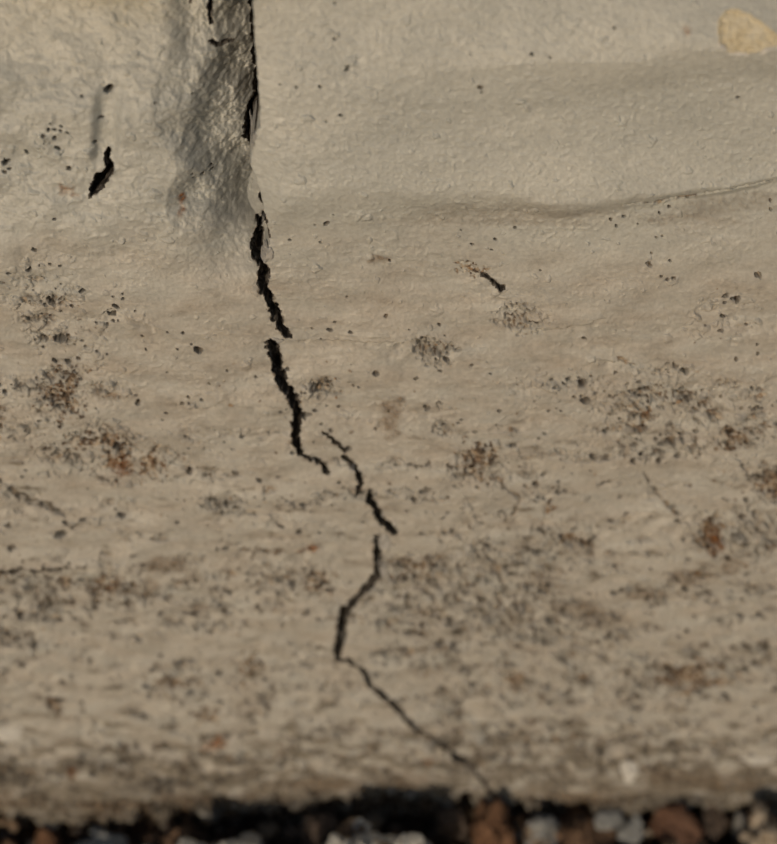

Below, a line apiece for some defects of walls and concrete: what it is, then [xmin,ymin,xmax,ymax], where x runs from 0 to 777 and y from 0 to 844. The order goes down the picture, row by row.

crack [189,0,260,148]
peeling [717,8,777,56]
crack [250,192,502,800]